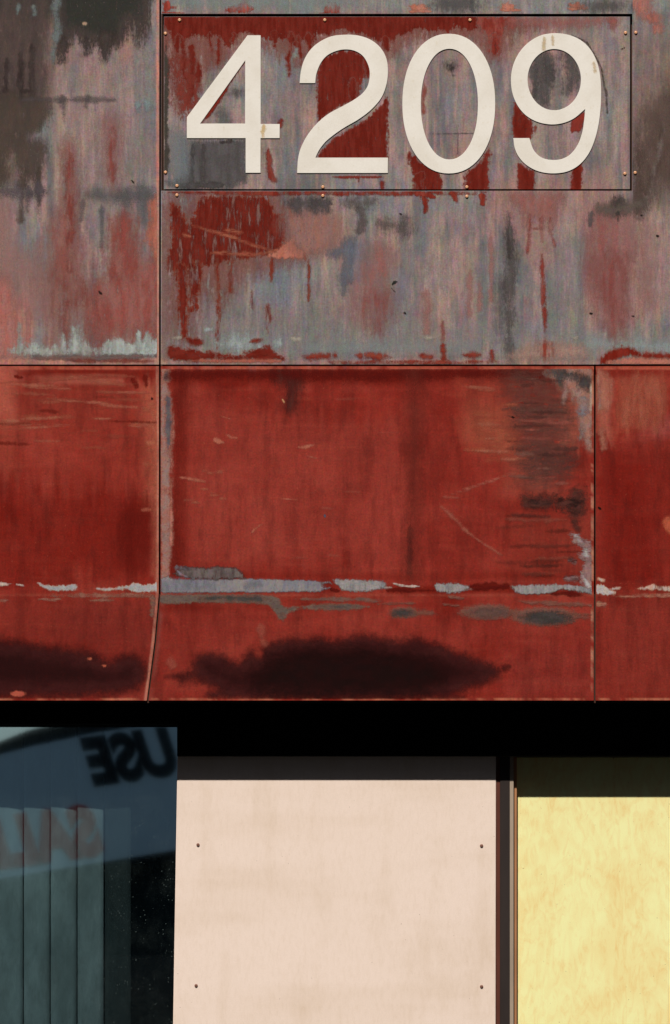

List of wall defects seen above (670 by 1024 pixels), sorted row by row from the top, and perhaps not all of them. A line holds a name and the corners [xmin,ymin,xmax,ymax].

rust [164,17,617,119]
water stain [0,0,151,223]
rust [48,118,494,364]
water stain [11,326,157,361]
rust [600,345,670,364]
peeling [38,582,77,592]
peeling [435,583,469,593]
rust [470,582,510,591]
rust [522,591,606,615]
peeling [638,584,670,592]
water stain [0,641,147,698]
water stain [181,635,500,699]